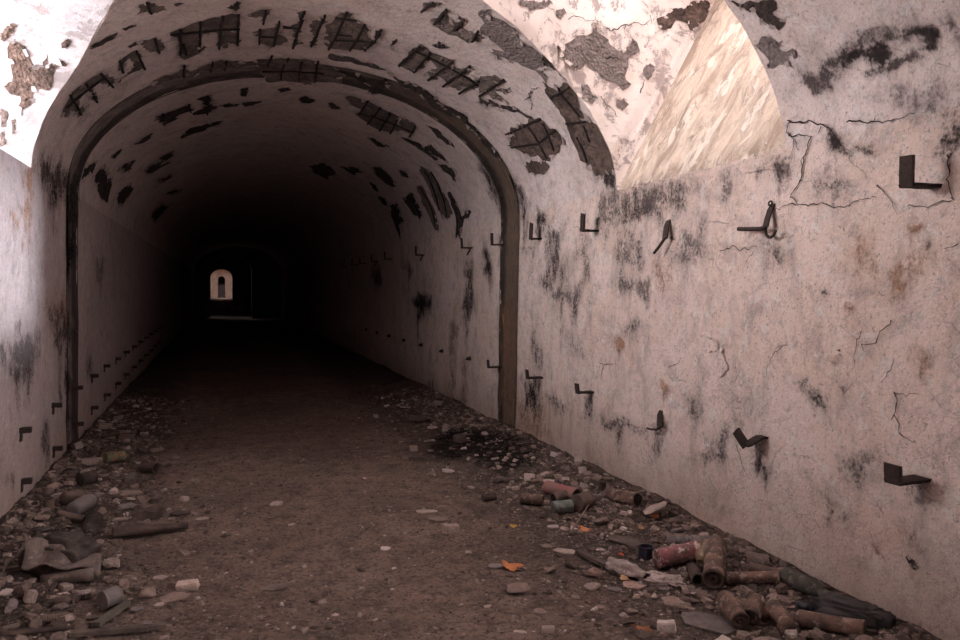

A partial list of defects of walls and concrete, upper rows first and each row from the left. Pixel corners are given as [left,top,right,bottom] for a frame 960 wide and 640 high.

spalling [0,23,72,147]
spalling [60,0,640,240]
spalling [657,0,710,31]
spalling [731,0,797,69]
leakage [798,19,960,95]
crack [776,113,954,213]
leakage [479,157,590,318]
leakage [594,163,698,302]
leakage [0,320,41,395]
crack [852,320,891,369]
crack [881,361,919,443]